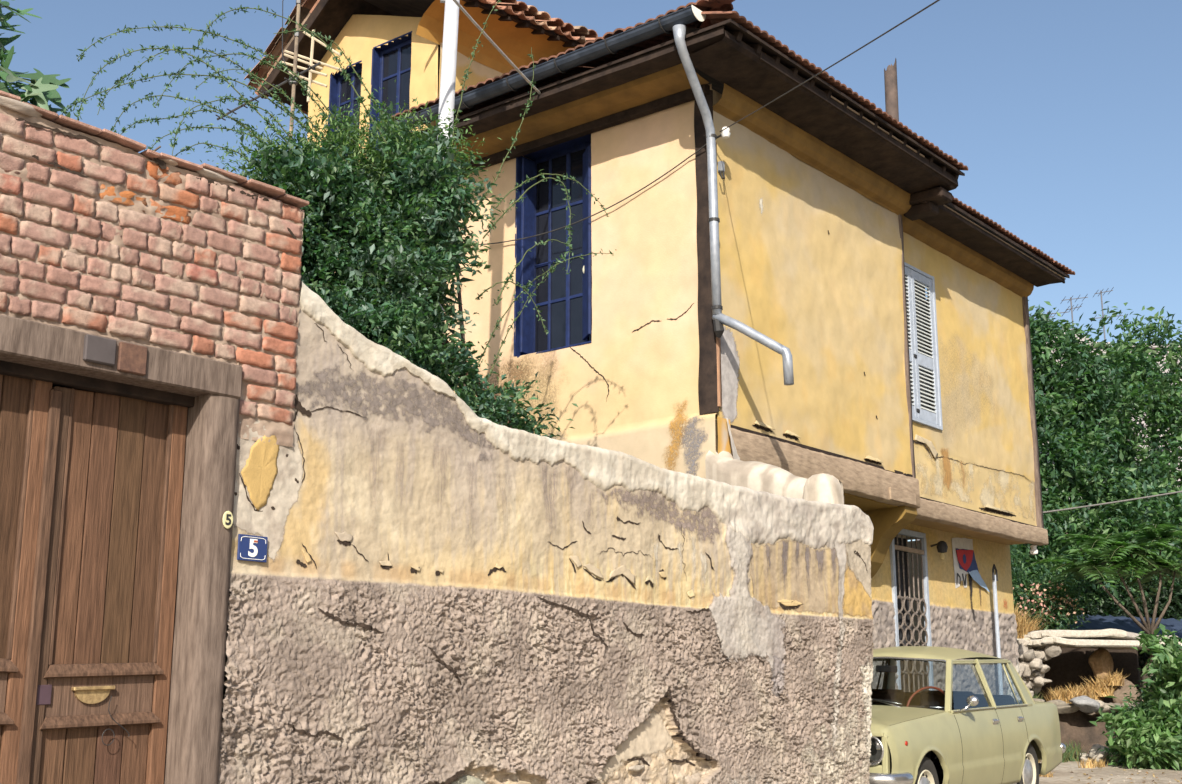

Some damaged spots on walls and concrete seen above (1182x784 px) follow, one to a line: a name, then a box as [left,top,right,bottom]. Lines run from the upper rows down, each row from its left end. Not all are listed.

crack [633,303,694,332]
crack [293,394,367,421]
leakage [488,359,555,419]
crack [569,346,609,401]
leakage [665,401,705,475]
peeling [233,420,305,560]
leakage [602,488,720,583]
spalling [645,569,667,587]
leakage [750,539,849,614]
spalling [587,687,717,784]
spalling [426,766,544,784]